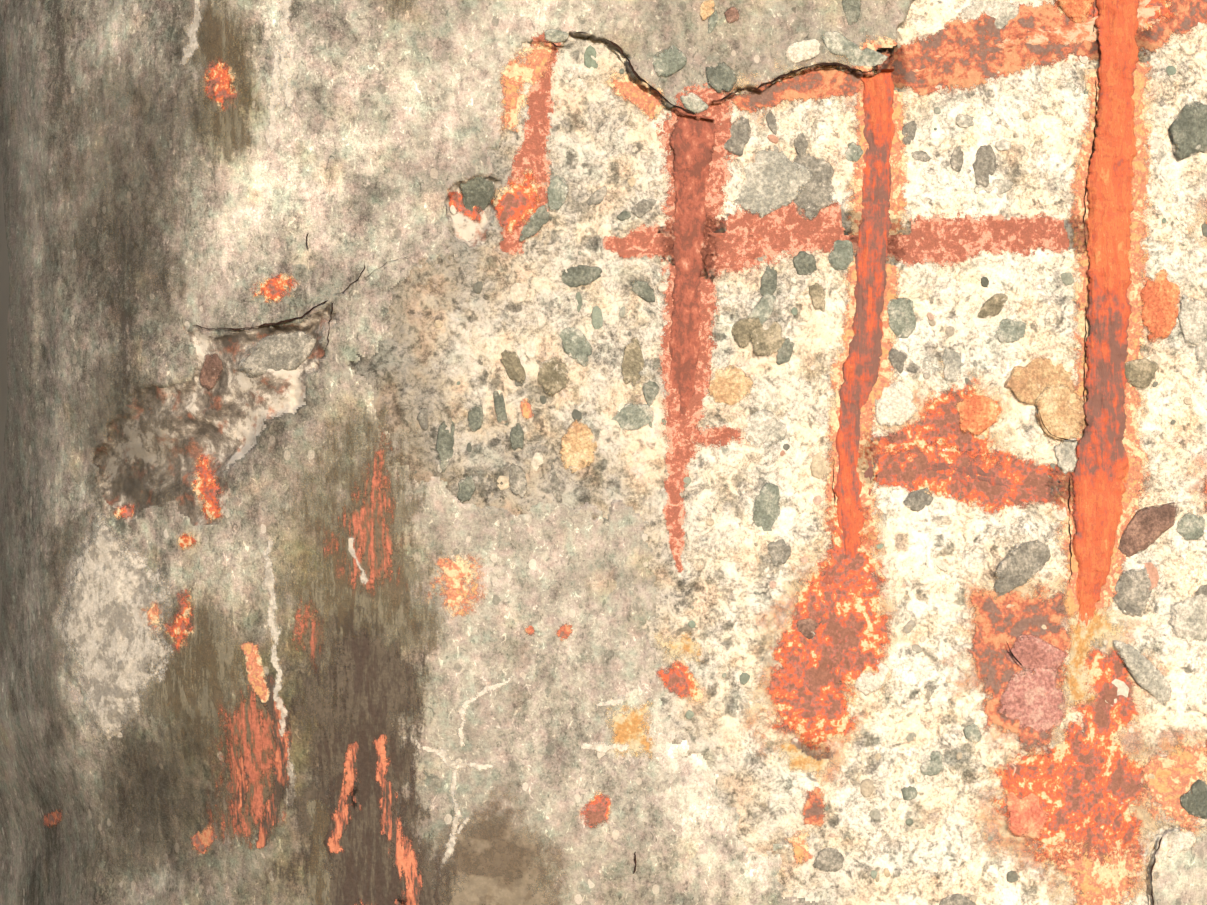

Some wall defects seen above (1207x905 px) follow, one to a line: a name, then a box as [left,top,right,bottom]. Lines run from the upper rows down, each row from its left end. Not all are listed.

corrosion [204,62,237,109]
corrosion [500,41,553,132]
corrosion [1145,0,1175,30]
spalling [93,304,336,526]
crack [192,259,398,349]
corrosion [685,424,747,451]
spalling [347,0,1207,905]
corrosion [879,378,1010,465]
peeling [54,518,174,740]
corrosion [191,433,456,905]
corrosion [748,500,893,864]
corrosion [956,578,1207,905]